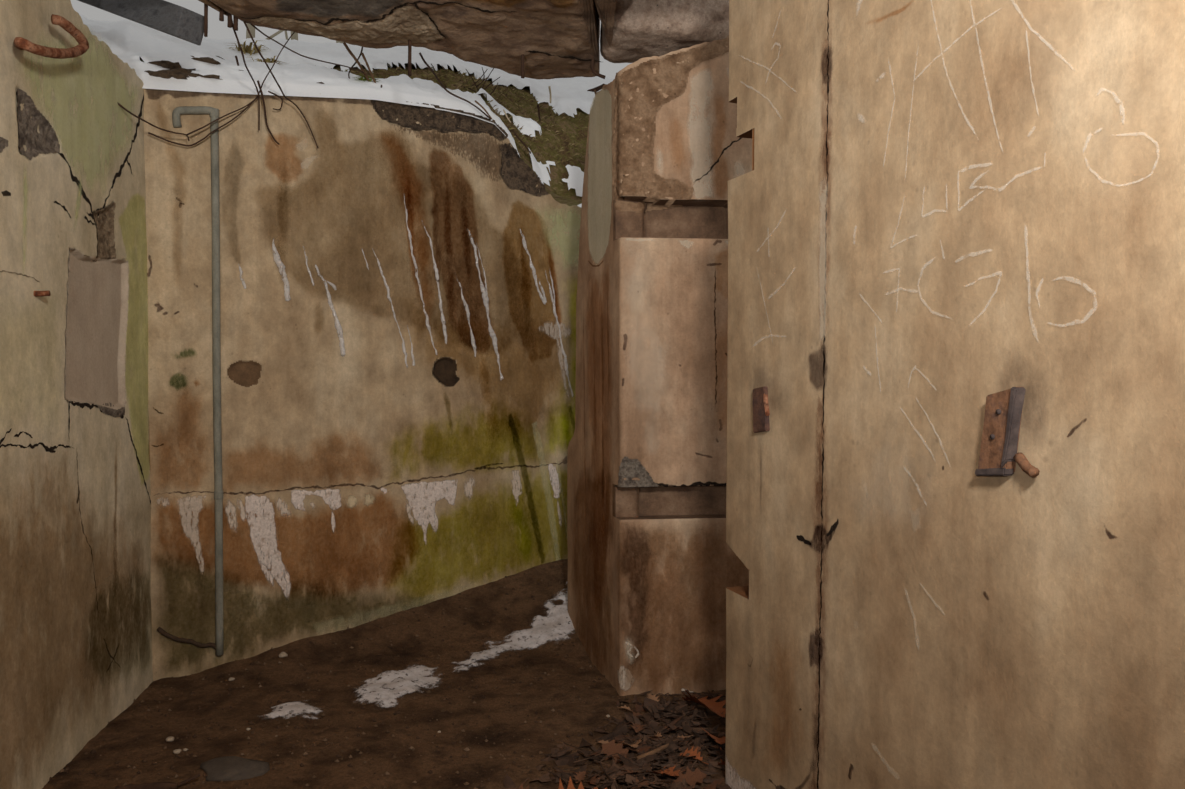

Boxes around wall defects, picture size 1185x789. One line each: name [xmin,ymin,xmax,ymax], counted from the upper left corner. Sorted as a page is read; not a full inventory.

crack [695,138,742,181]
leakage [362,248,415,366]
leakage [404,198,447,355]
leakage [459,282,476,357]
leakage [469,231,503,380]
leakage [520,230,573,397]
crack [797,0,839,789]
crack [0,401,567,609]
leakage [511,460,529,502]
efflorescence [548,463,562,524]
spalling [618,457,658,487]